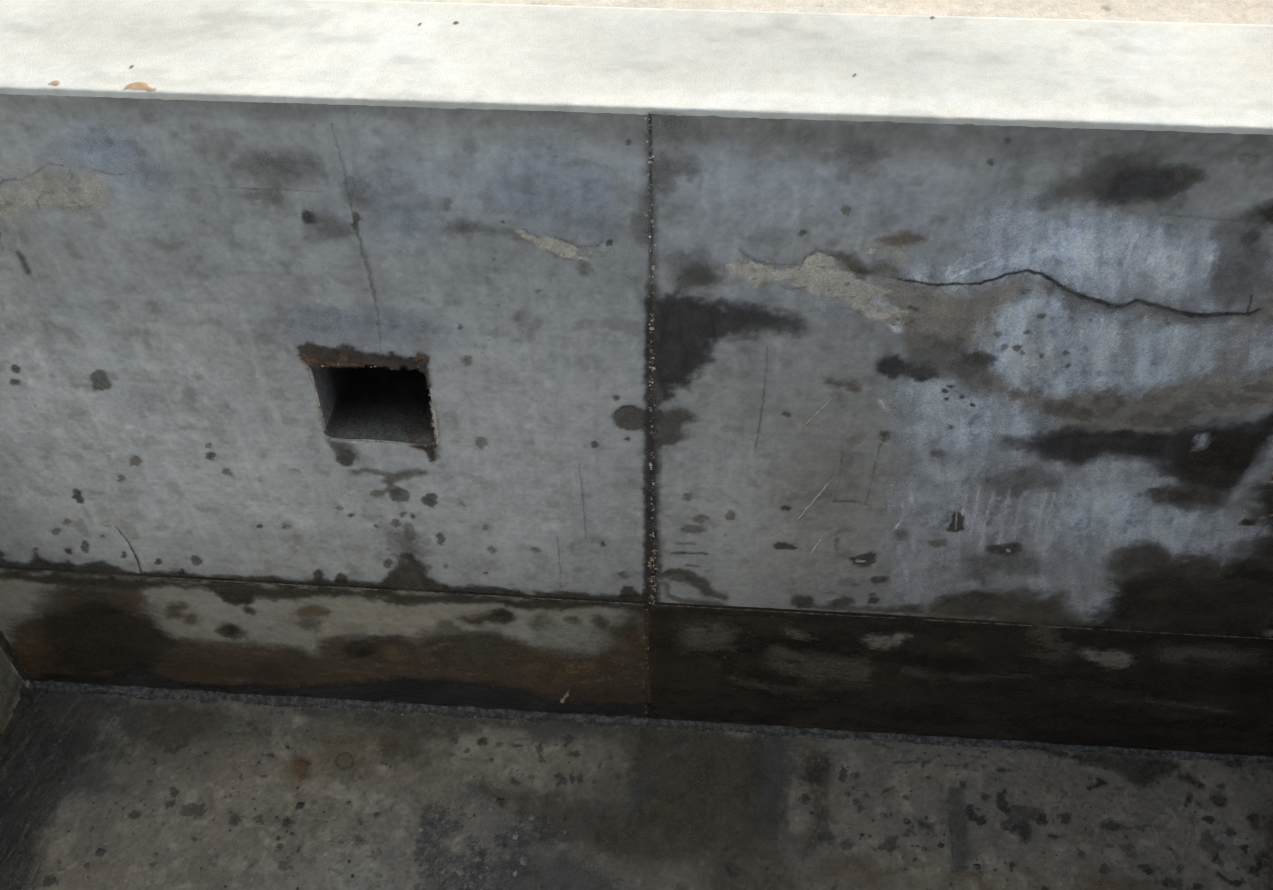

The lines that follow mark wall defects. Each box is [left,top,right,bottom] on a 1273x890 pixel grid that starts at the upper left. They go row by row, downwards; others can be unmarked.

spalling [517,230,598,261]
peeling [728,252,1273,432]
crack [748,252,1261,318]
damp [0,153,1273,783]